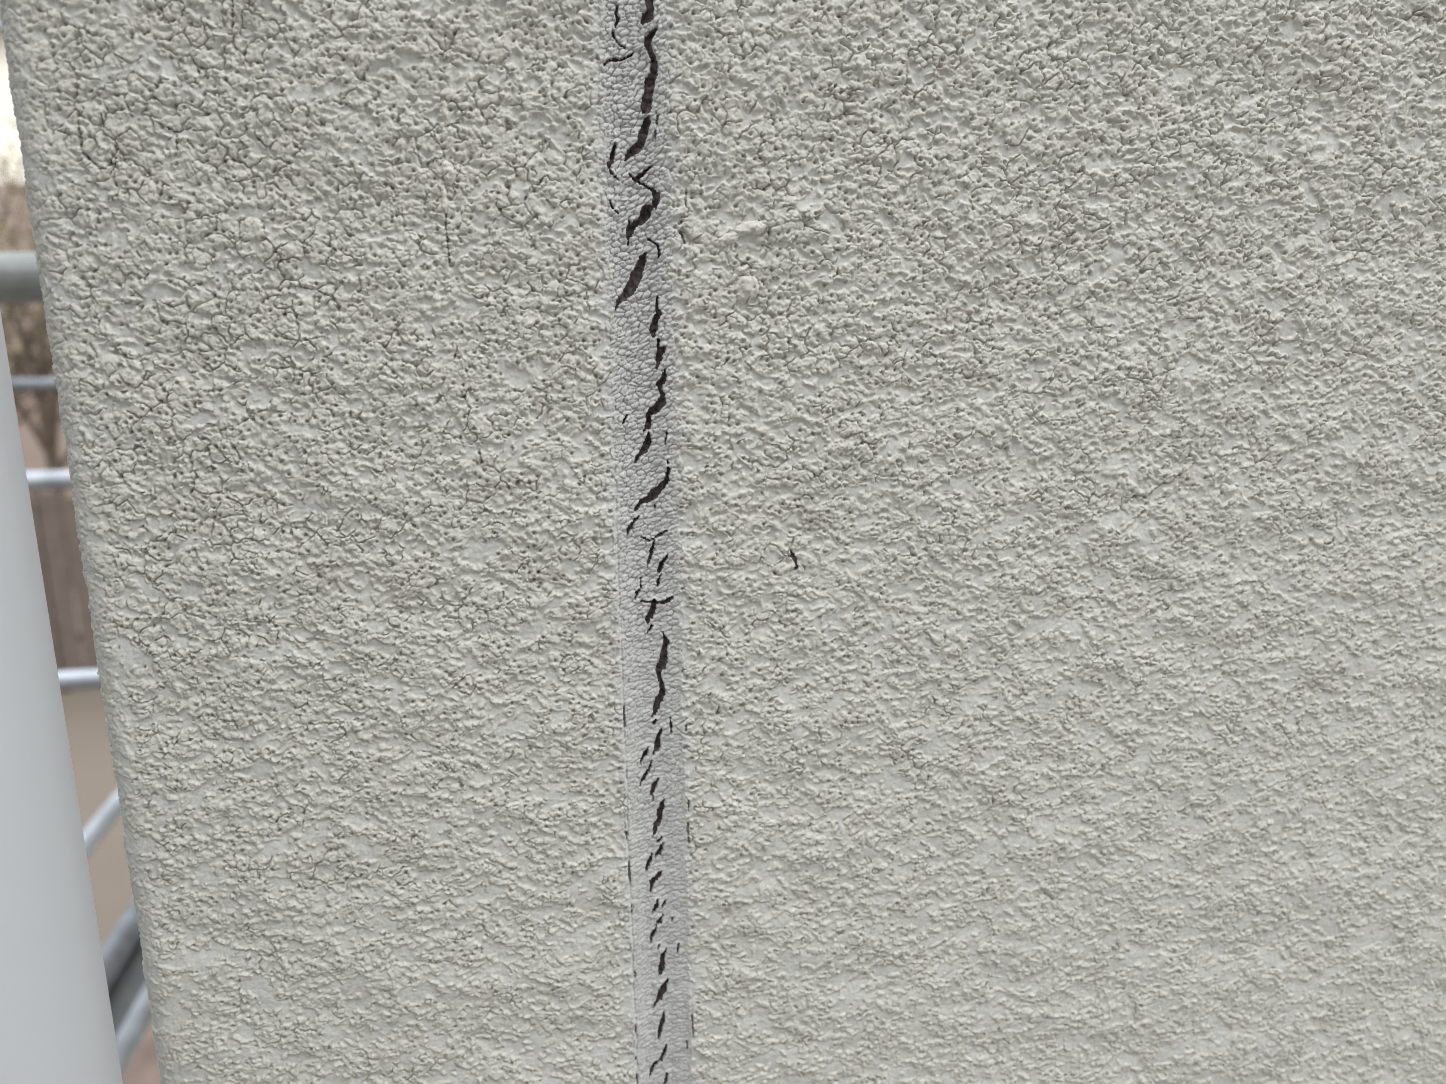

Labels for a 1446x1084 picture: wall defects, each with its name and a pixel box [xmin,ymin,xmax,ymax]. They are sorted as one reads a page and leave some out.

crack [603,0,694,1084]